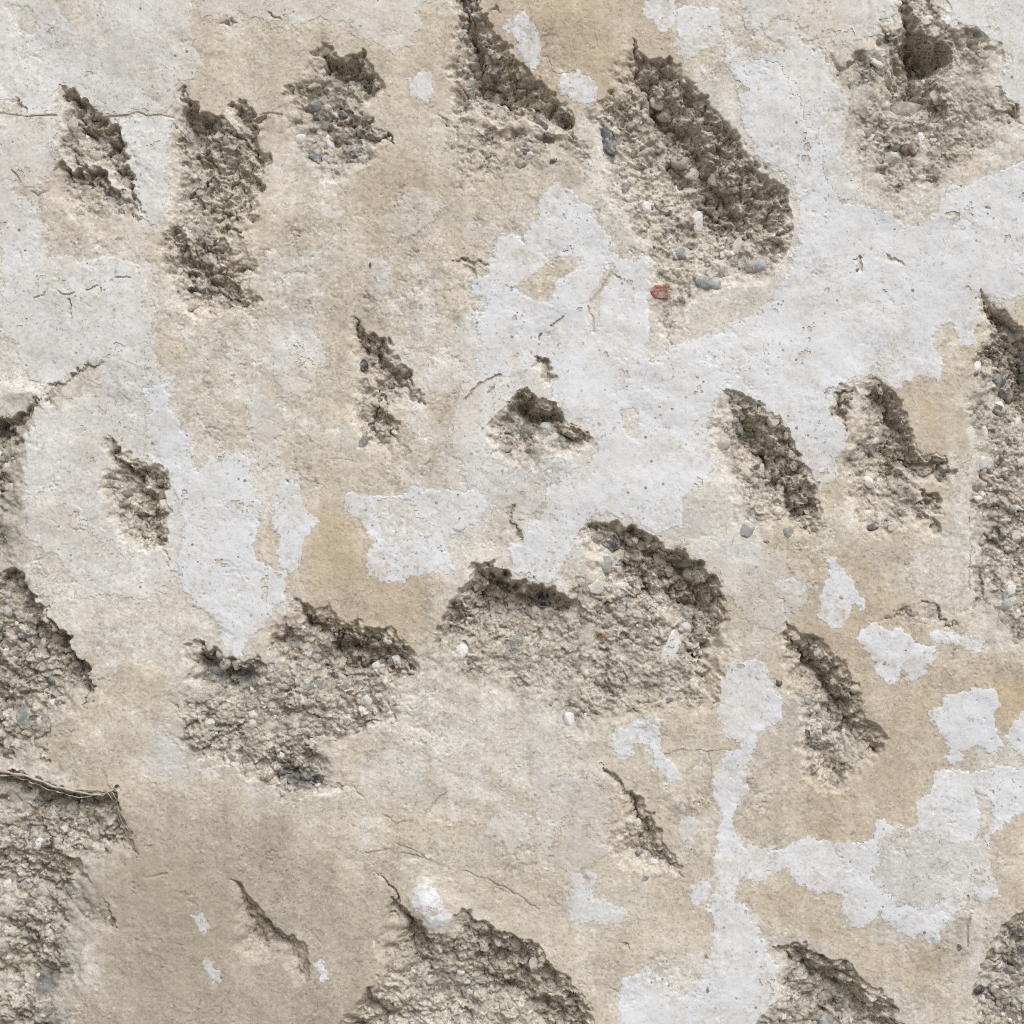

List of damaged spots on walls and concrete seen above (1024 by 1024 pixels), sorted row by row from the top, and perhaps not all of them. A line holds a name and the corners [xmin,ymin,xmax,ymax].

peeling [198,0,433,56]
spalling [281,42,399,184]
spalling [0,0,330,1024]
peeling [340,0,1024,1024]
spalling [171,597,420,800]